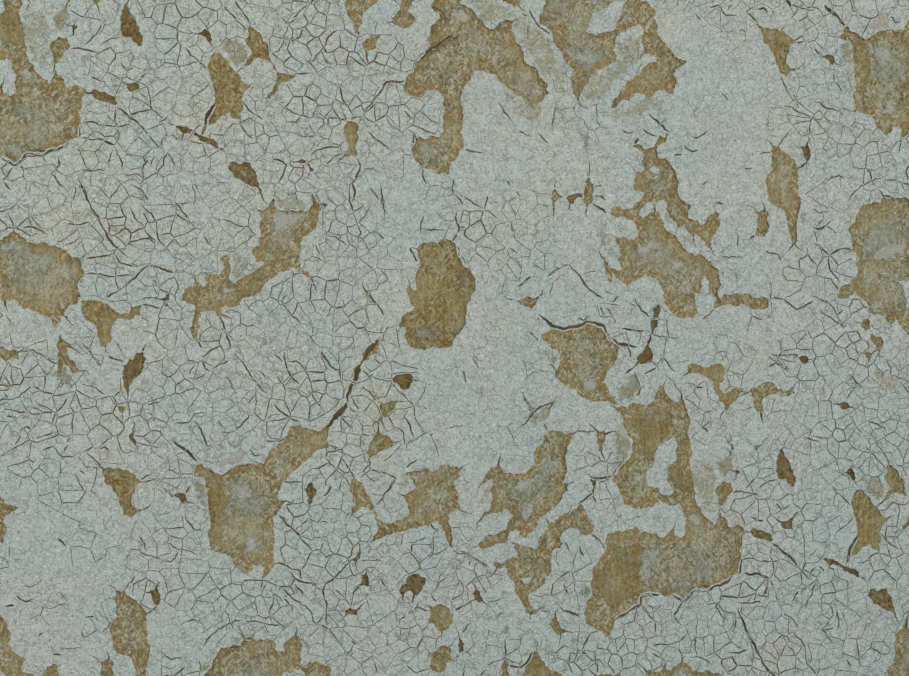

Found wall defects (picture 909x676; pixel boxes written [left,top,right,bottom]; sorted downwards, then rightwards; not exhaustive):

peeling [0,0,119,164]
peeling [401,0,689,184]
peeling [745,0,909,153]
crack [0,106,178,298]
peeling [0,159,330,455]
crack [147,281,384,447]
peeling [84,112,801,648]
crack [517,263,645,357]
crack [770,158,909,342]
peeling [828,189,909,369]
crack [181,515,357,654]
crack [559,543,840,676]